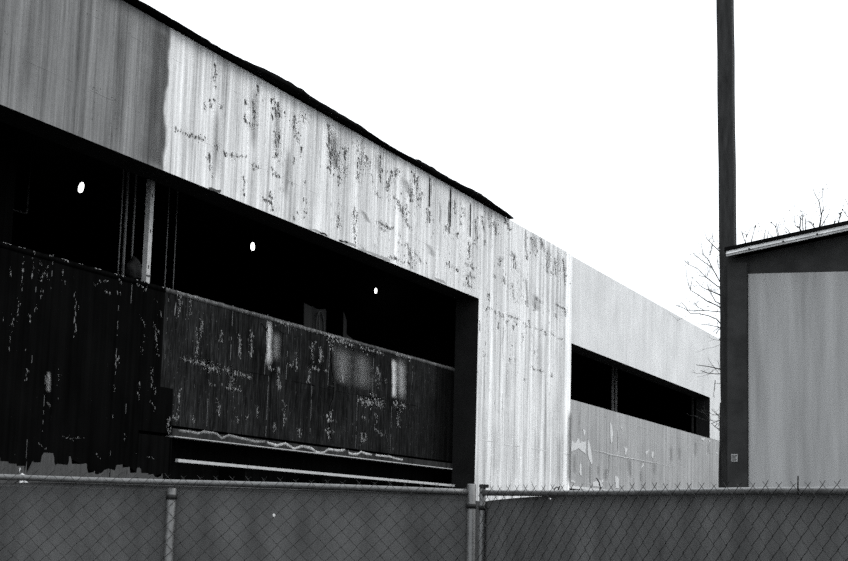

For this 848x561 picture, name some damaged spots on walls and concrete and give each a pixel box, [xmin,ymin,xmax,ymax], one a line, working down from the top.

leakage [157,38,167,162]
peeling [243,84,307,178]
peeling [207,145,259,193]
peeling [326,124,431,228]
peeling [339,207,427,270]
peeling [445,199,511,288]
peeling [507,237,567,283]
peeling [180,321,253,392]
peeling [275,320,381,383]
peeling [571,429,593,483]